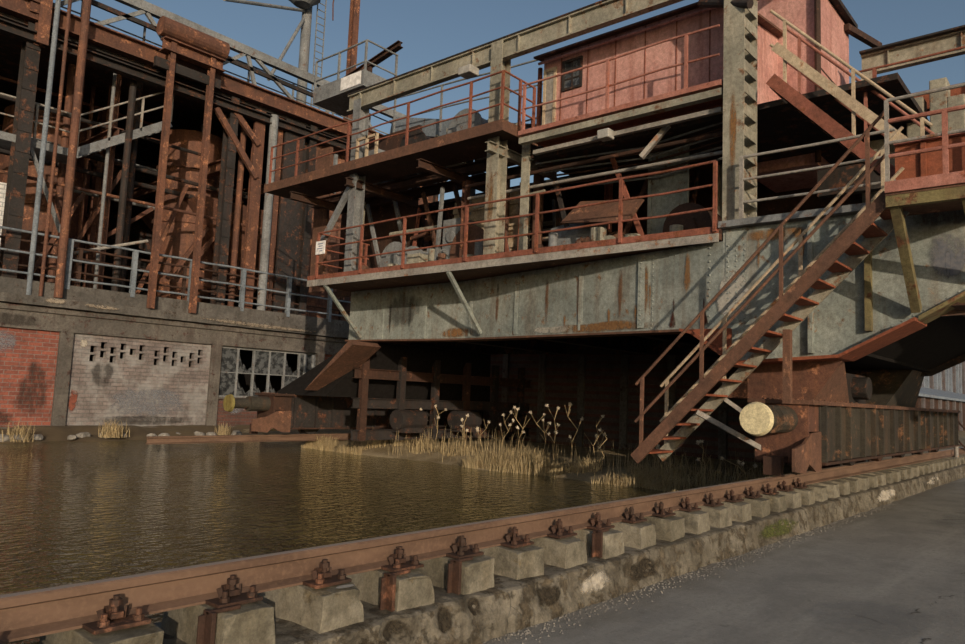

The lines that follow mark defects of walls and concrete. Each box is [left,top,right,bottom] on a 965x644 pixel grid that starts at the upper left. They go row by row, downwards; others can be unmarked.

rust [561,268,651,332]
damp [582,572,607,592]